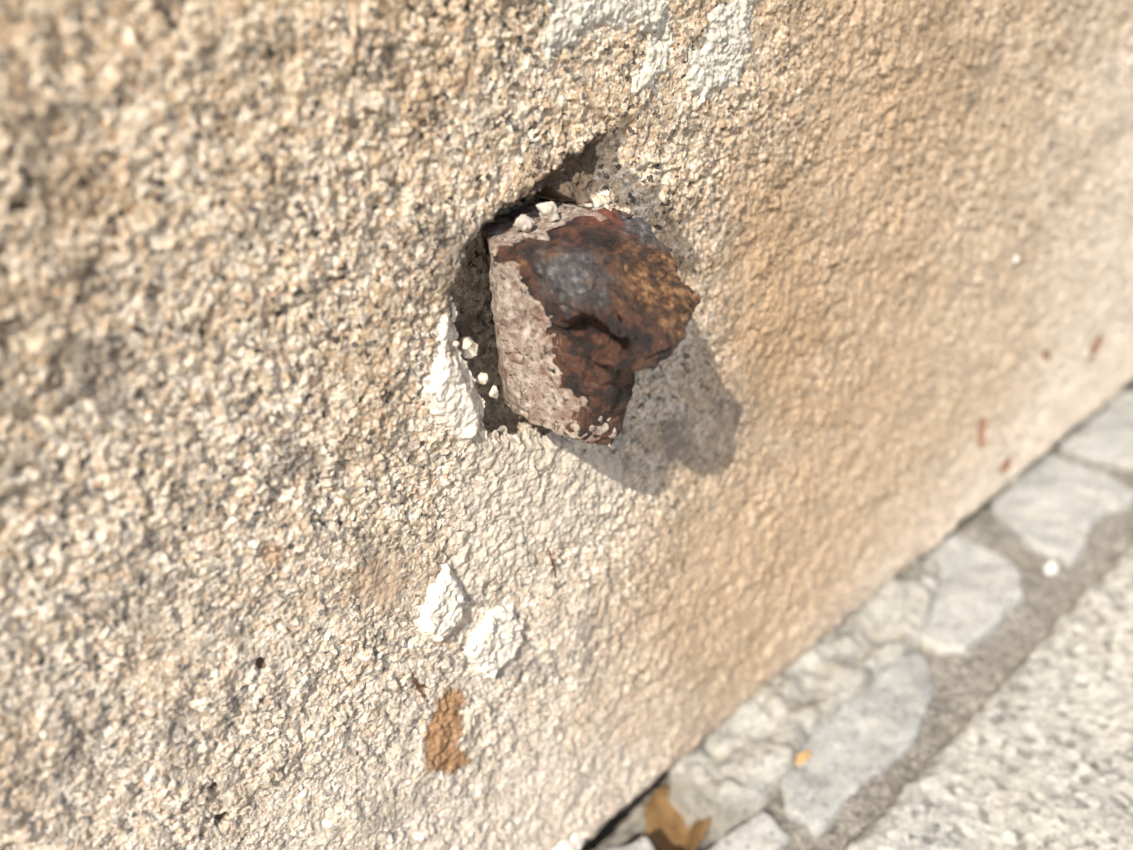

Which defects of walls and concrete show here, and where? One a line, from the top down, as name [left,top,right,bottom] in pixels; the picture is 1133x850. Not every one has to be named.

spalling [465,132,608,250]
corrosion [424,688,472,774]